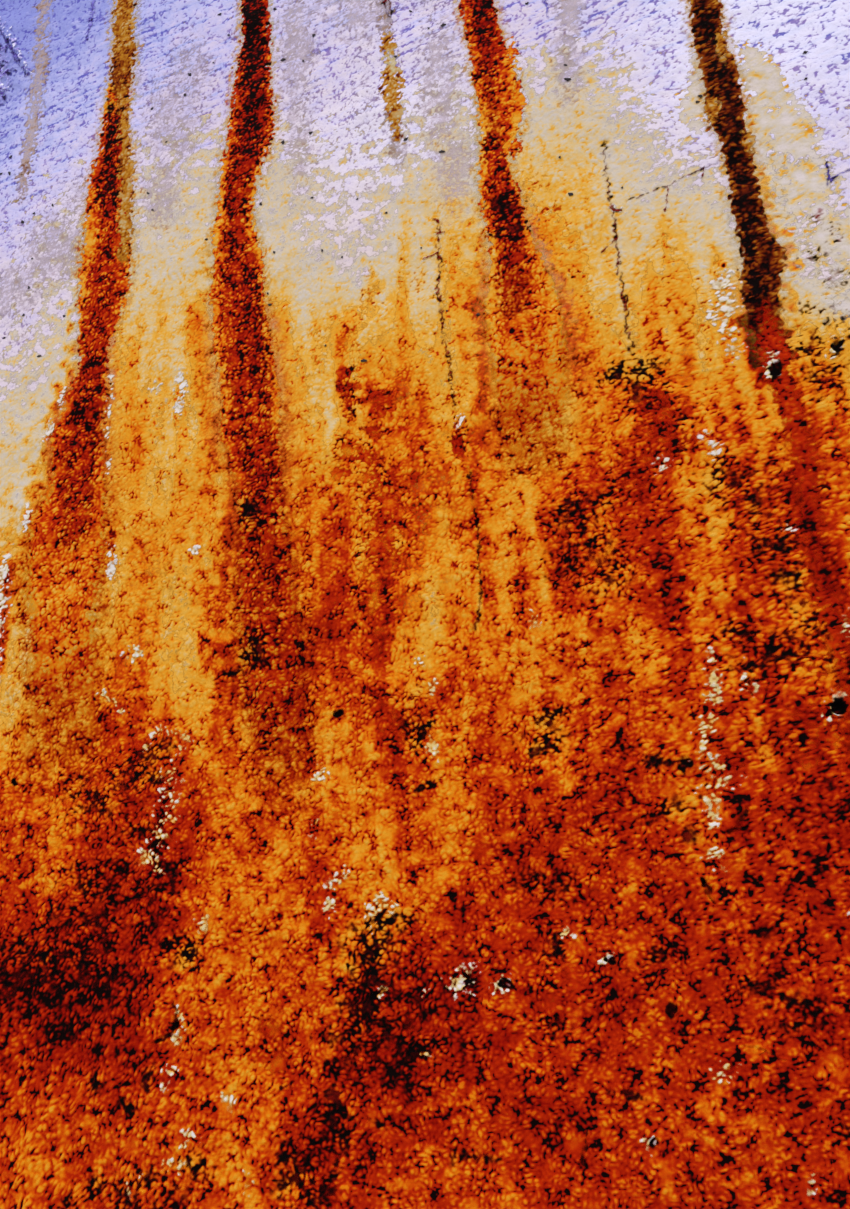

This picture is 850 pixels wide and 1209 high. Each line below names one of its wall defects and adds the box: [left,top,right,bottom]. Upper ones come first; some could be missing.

corrosion [450,63,468,82]
corrosion [338,143,357,166]
corrosion [688,144,714,162]
corrosion [814,145,850,204]
corrosion [56,689,80,705]
corrosion [829,712,850,733]
corrosion [805,727,819,745]